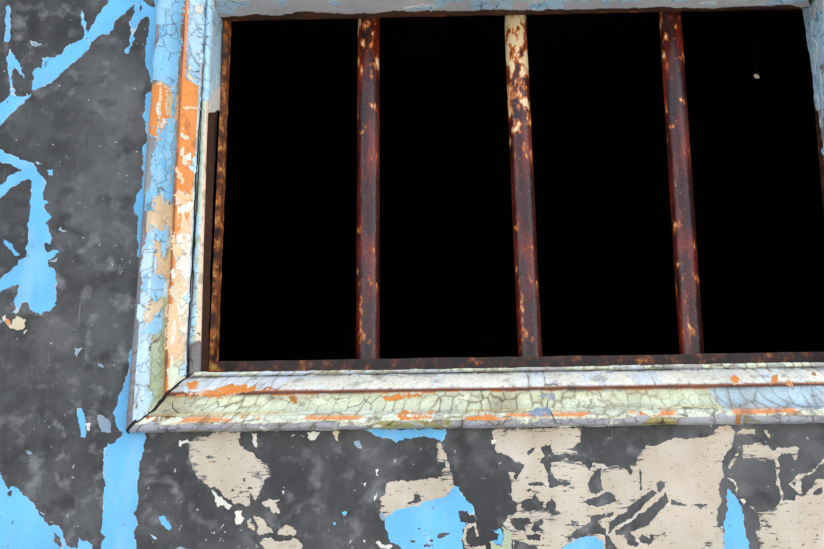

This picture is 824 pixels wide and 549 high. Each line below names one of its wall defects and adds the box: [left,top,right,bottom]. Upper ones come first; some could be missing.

crack [126,86,203,434]
peeling [0,0,824,413]
peeling [0,349,146,549]
peeling [179,432,303,549]
peeling [529,392,556,417]
peeling [365,410,824,549]